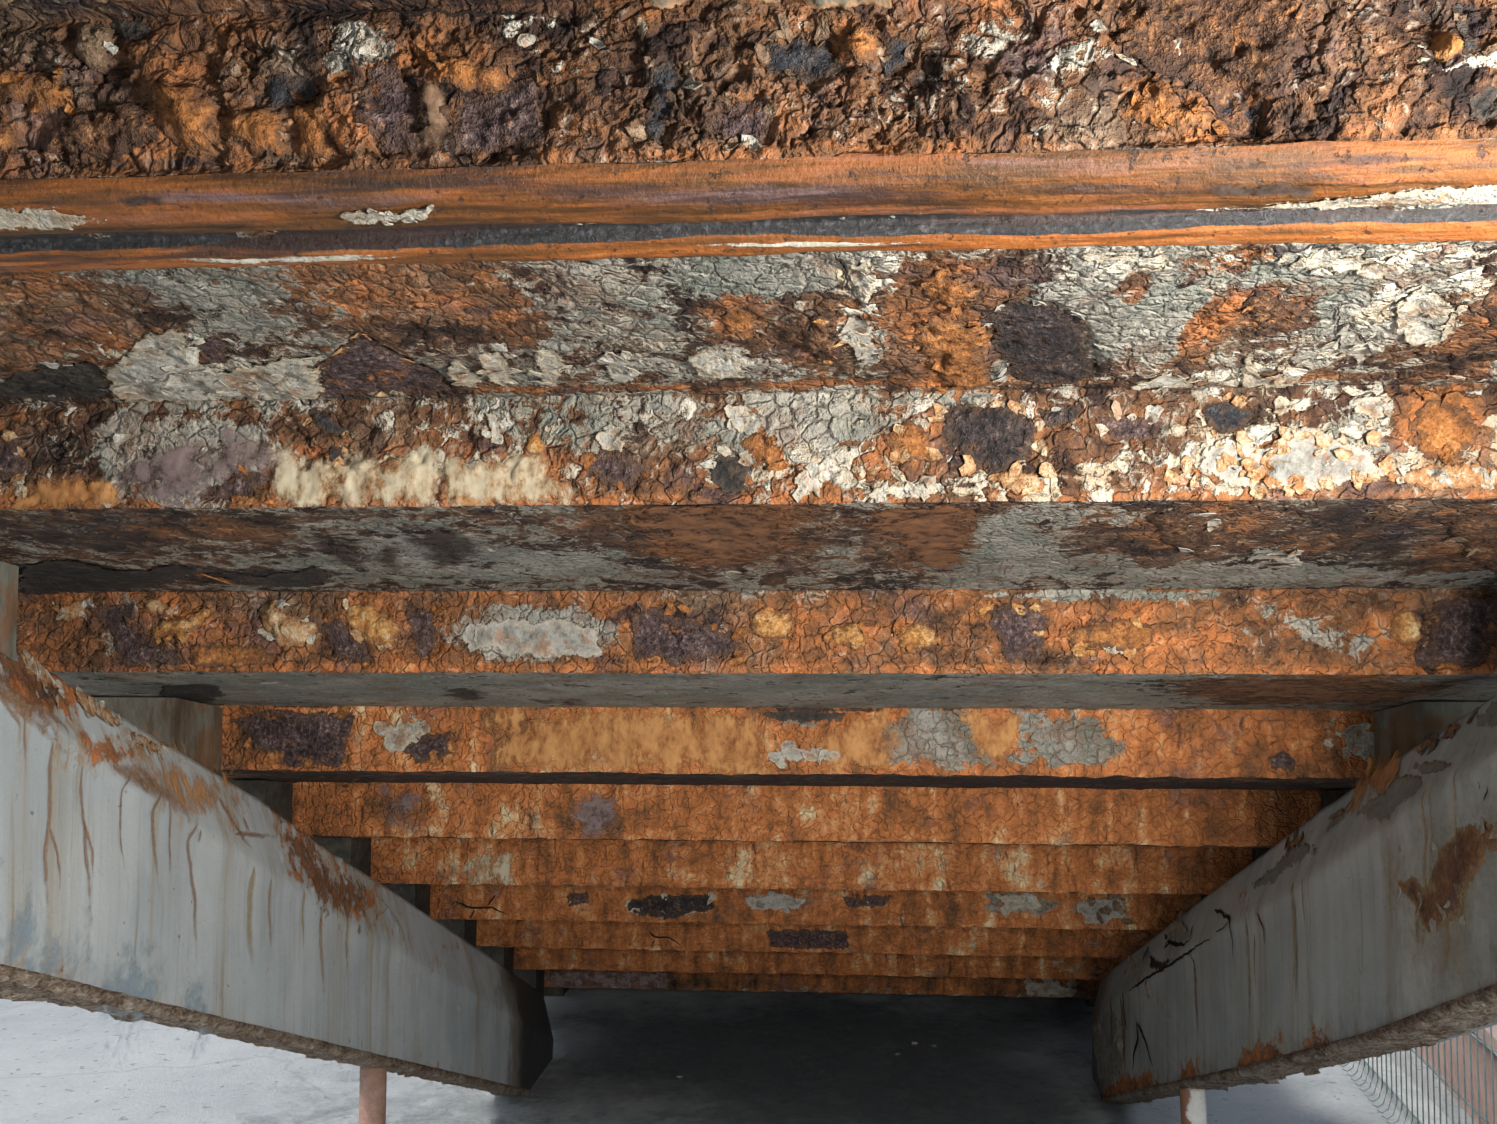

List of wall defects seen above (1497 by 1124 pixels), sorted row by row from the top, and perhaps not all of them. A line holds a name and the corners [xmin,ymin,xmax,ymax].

rust [754,14,929,85]
rust [0,22,339,162]
rust [351,42,550,165]
rust [703,94,777,151]
peeling [0,206,107,231]
peeling [1278,248,1468,364]
peeling [102,329,325,404]
peeling [446,350,572,390]
peeling [1163,356,1497,500]
peeling [863,475,945,502]
rust [230,706,355,769]
crack [1122,909,1265,1071]